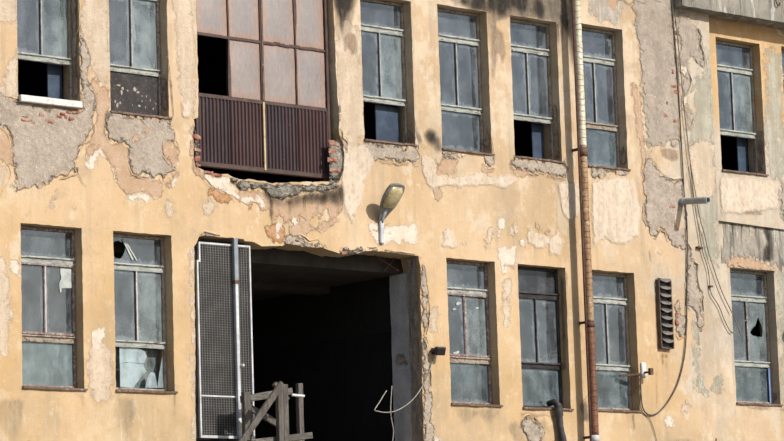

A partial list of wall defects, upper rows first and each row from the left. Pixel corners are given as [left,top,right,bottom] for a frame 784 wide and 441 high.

leakage [337,0,354,26]
leakage [462,0,574,60]
flaking render [0,0,421,247]
flaking render [509,105,569,181]
flaking render [588,0,717,340]
peeling [340,222,418,255]
peeling [0,255,21,357]
peeling [85,327,115,402]
peeling [188,249,196,400]
flaking render [421,264,442,441]
flaking render [520,413,546,441]